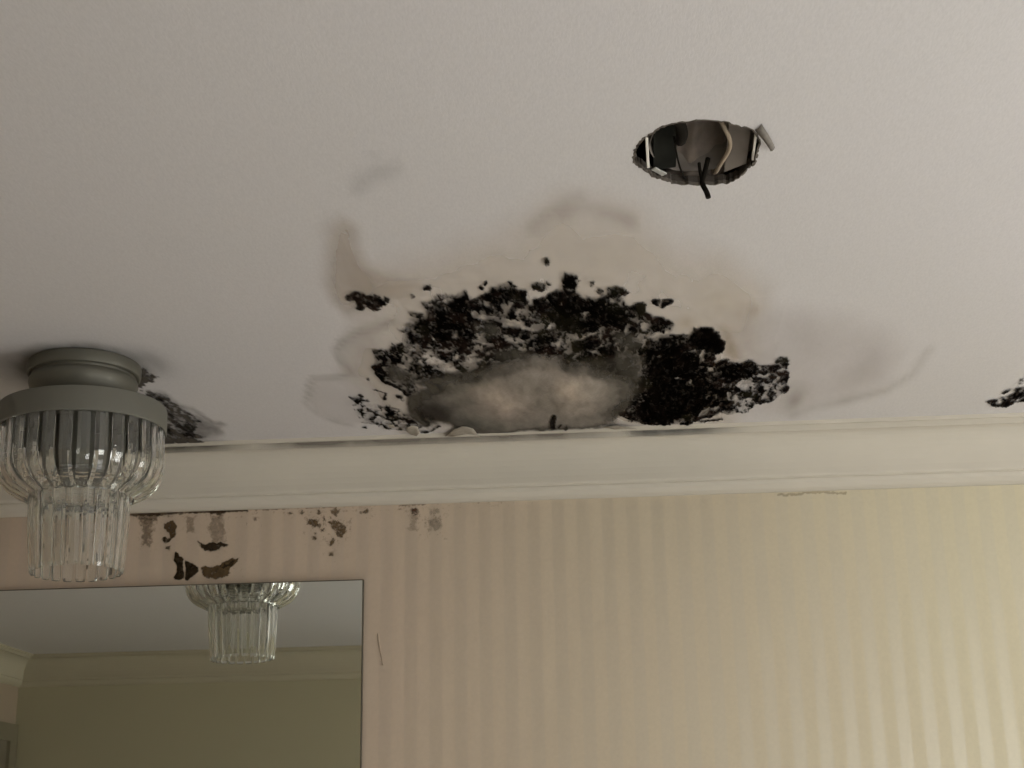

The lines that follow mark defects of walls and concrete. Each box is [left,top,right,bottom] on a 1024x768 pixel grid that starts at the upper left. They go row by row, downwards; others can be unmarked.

leakage [346,273,790,434]
leakage [138,369,211,444]
leakage [987,379,1024,408]